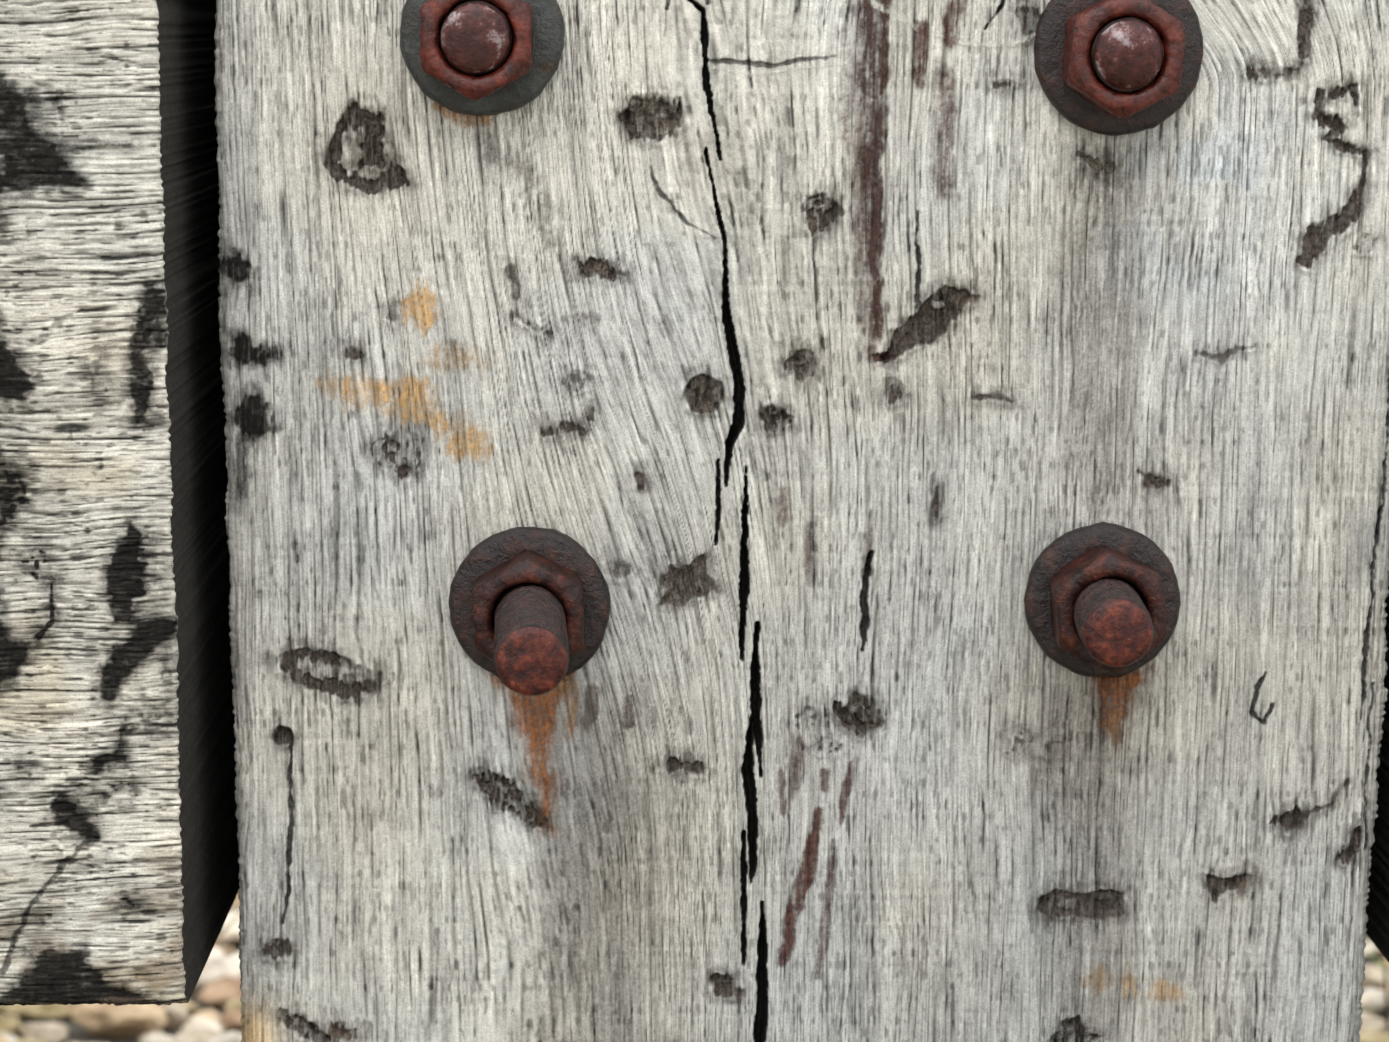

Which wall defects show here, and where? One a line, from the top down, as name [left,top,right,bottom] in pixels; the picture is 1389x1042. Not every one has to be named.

crack [914,211,922,310]
crack [652,0,828,1042]
crack [860,550,873,651]
rust [1093,670,1142,734]
rust [493,675,578,831]